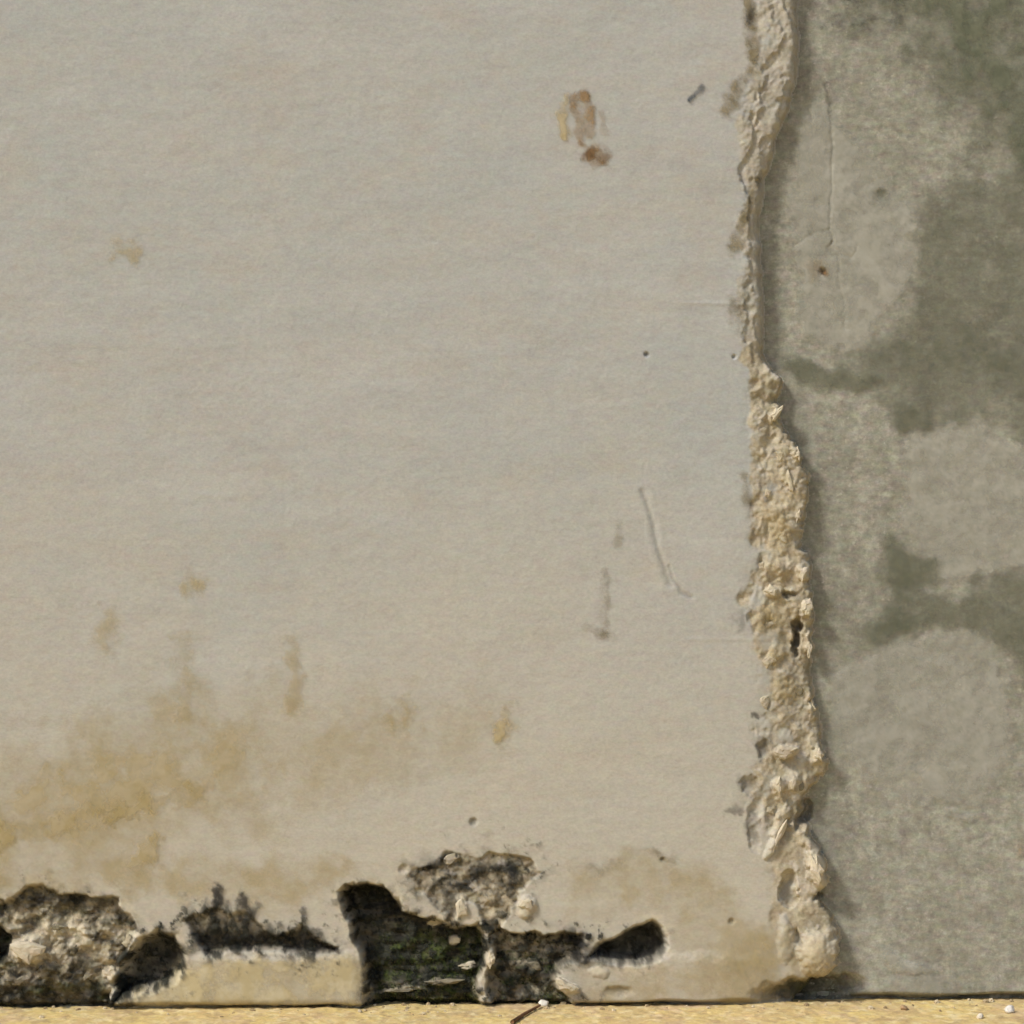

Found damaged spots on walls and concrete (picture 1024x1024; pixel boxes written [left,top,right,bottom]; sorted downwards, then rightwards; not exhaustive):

corrosion [558,91,604,164]
damp [899,0,1024,167]
damp [795,120,915,348]
damp [784,357,876,391]
peeling [721,0,1024,1000]
damp [836,412,1024,796]
spalling [0,848,670,1008]
damp [411,847,545,898]